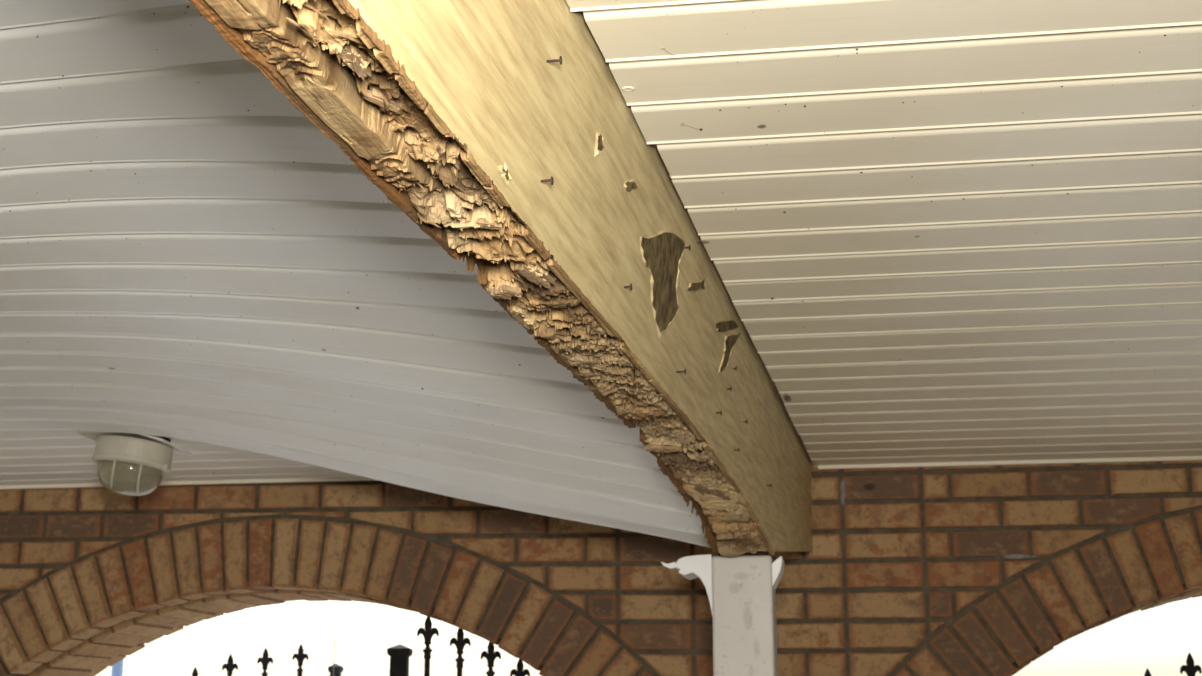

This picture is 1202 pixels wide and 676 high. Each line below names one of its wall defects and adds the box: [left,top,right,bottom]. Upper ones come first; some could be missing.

peeling [594,130,605,157]
peeling [497,164,512,186]
peeling [623,178,638,195]
peeling [640,230,705,338]
peeling [714,319,741,373]